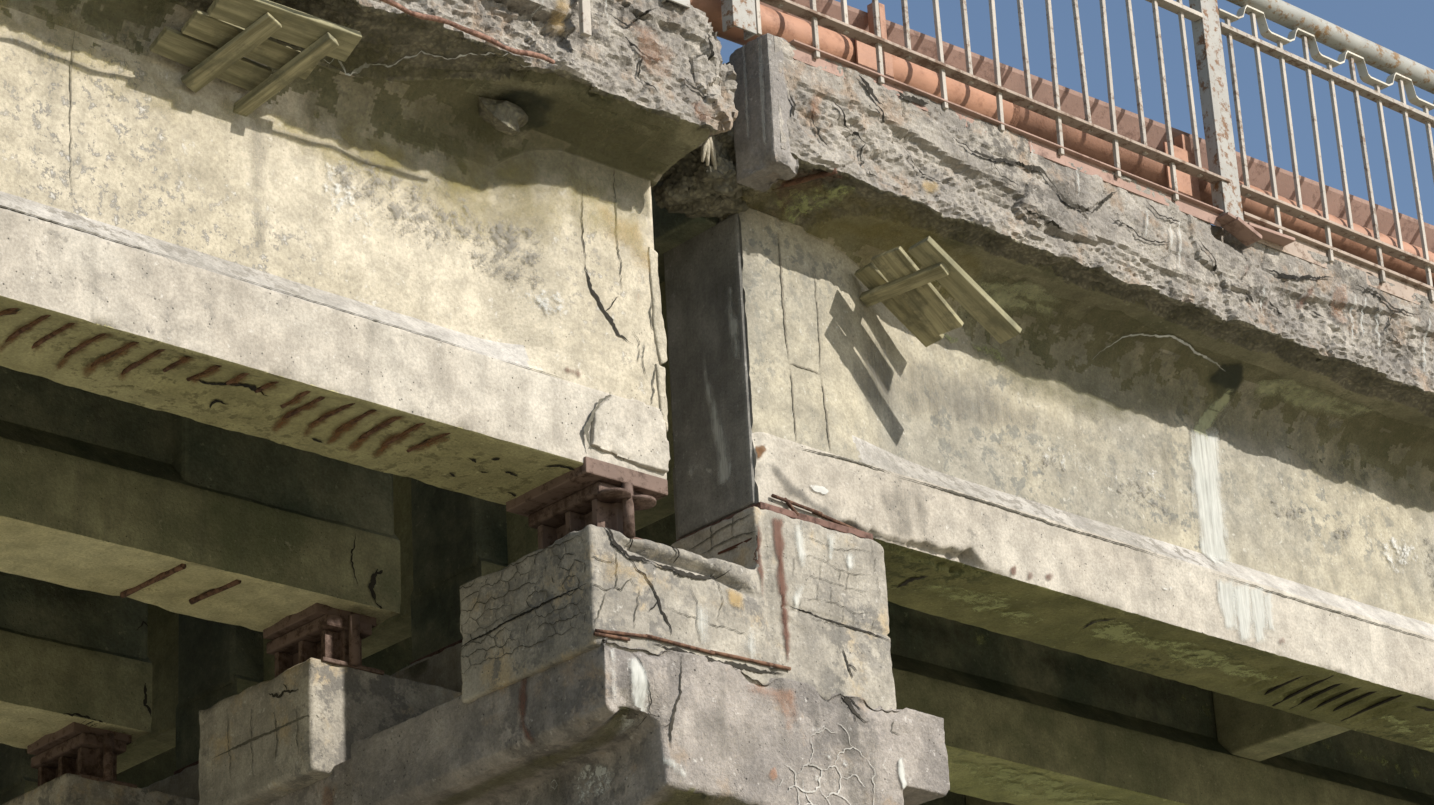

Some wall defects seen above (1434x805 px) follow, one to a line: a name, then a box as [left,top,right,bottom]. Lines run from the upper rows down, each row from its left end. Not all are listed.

spalling [380,0,555,64]
rust [0,310,75,350]
rust [58,334,219,383]
rust [272,395,448,456]
crack [581,171,656,404]
crack [779,241,1172,560]
crack [953,137,1417,344]
leakage [1191,390,1231,563]
crack [459,514,781,749]
rust [718,518,790,662]
crack [778,521,900,805]
leakage [1218,581,1273,641]